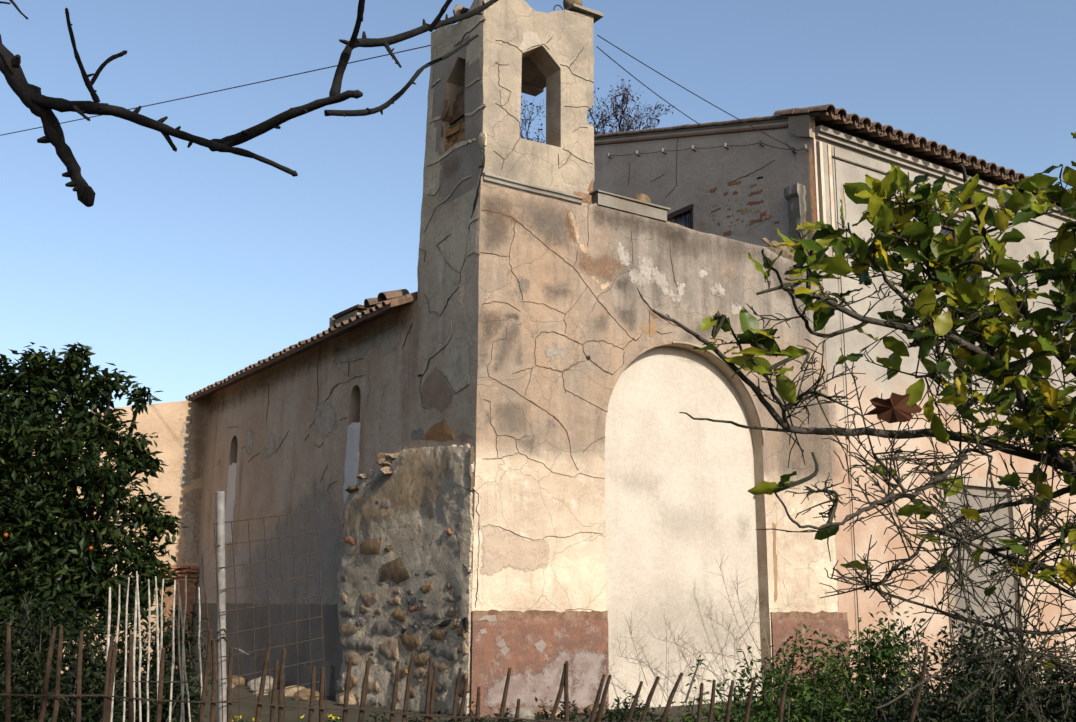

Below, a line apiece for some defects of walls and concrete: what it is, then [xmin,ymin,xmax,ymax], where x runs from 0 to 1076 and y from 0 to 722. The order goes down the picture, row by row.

crack [402,17,679,608]
spalling [698,172,779,236]
spalling [761,238,795,262]
crack [219,358,365,491]
spalling [336,419,549,716]
peeling [483,640,608,710]